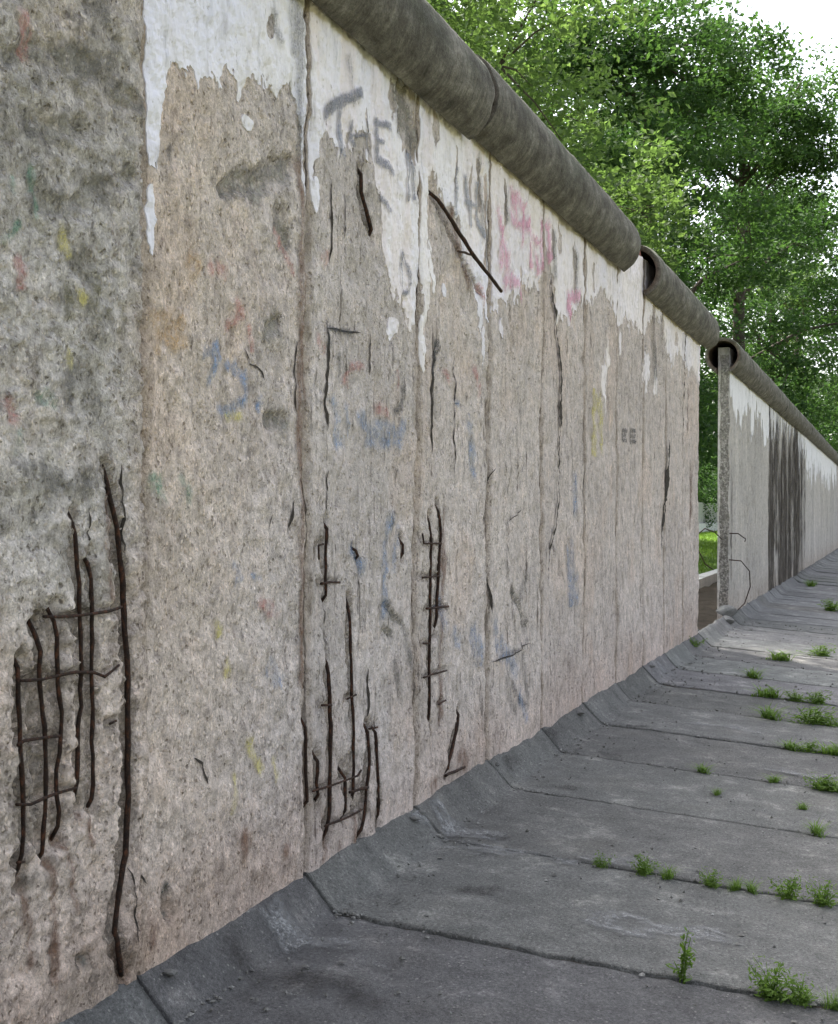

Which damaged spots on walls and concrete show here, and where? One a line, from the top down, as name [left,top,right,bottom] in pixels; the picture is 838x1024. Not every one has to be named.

peeling [142,0,700,412]
rust [297,323,305,471]
crack [548,280,586,576]
crack [661,337,686,550]
spalling [719,348,836,606]
water stain [768,405,806,591]
spalling [9,454,138,978]
rust [49,922,59,984]